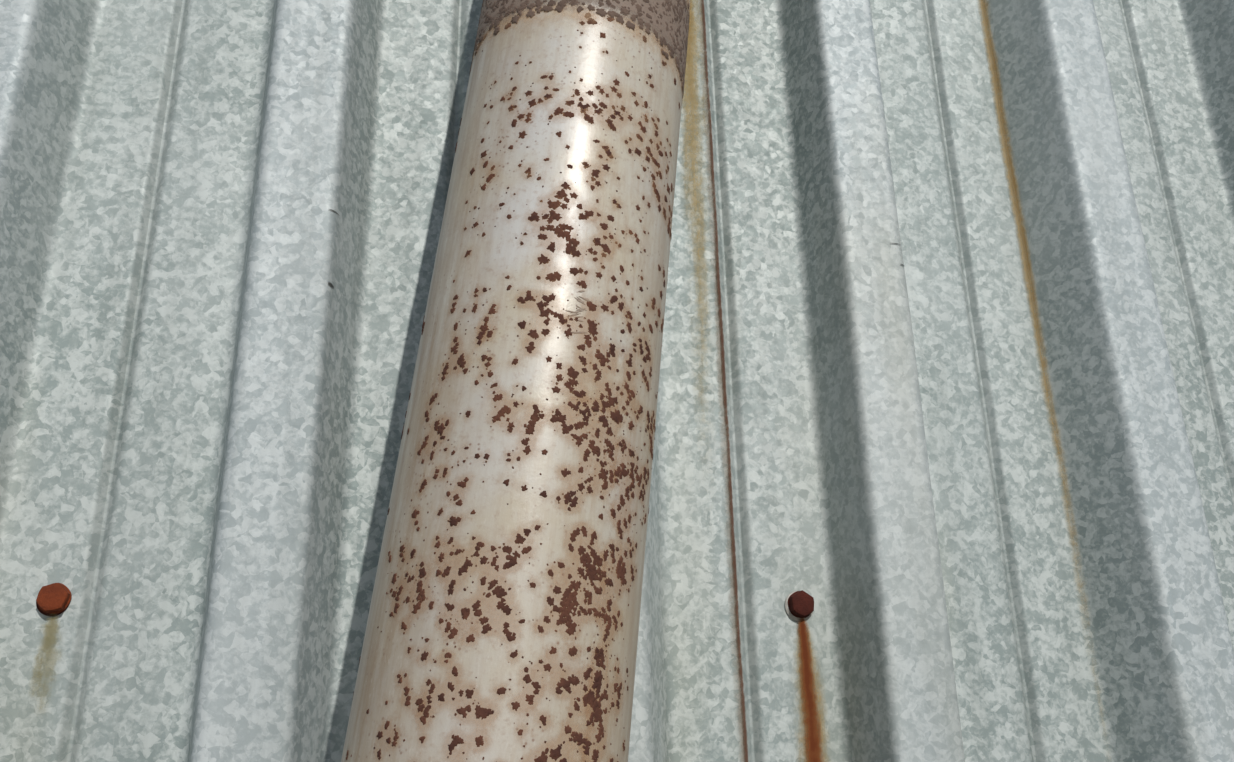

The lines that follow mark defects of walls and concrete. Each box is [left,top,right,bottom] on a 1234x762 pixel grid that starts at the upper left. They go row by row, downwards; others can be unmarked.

corrosion [373,0,748,762]
corrosion [980,0,1067,502]
corrosion [797,618,825,762]